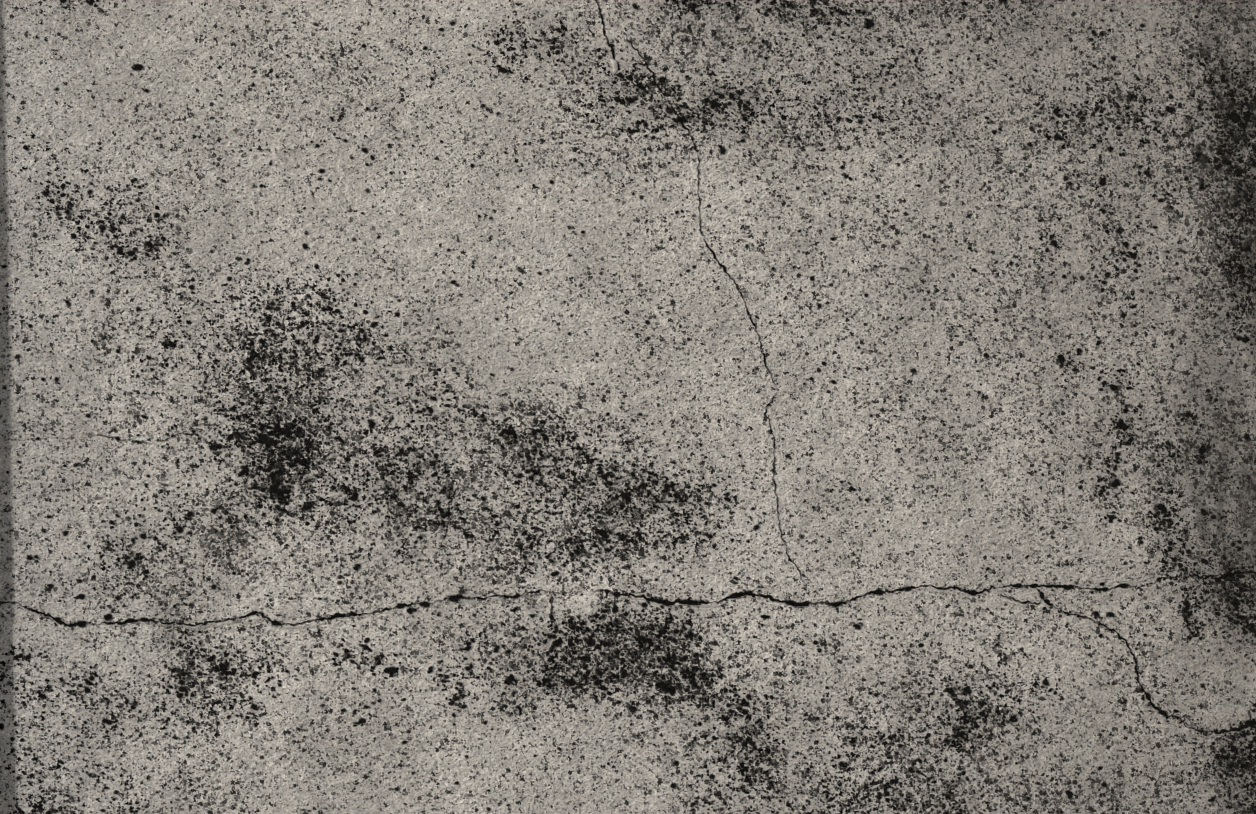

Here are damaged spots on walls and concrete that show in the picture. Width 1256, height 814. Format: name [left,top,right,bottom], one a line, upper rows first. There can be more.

crack [595,0,1256,737]
crack [96,423,213,447]
crack [0,571,567,632]